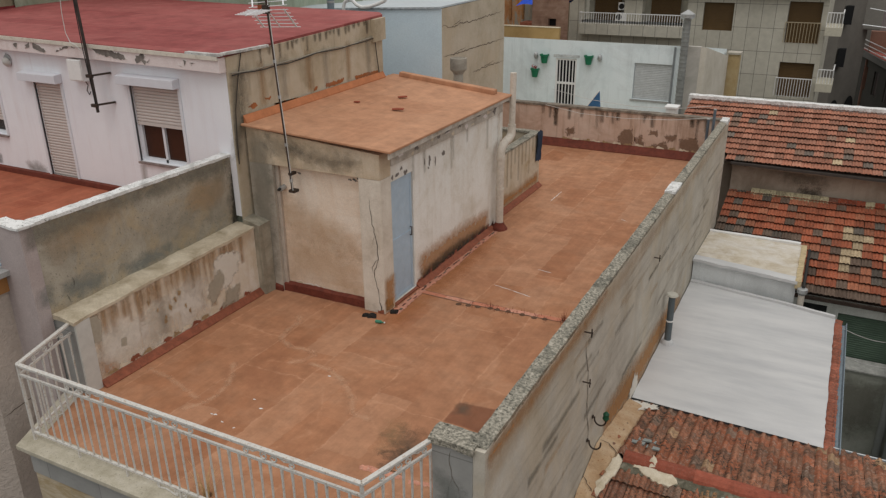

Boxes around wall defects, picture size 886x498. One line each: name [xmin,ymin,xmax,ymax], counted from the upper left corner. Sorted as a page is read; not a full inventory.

crack [442,11,501,28]
peeling [12,42,75,53]
peeling [91,48,150,66]
crack [445,38,503,71]
peeling [562,114,699,153]
crack [369,205,382,310]
water stain [421,215,487,278]
peeling [102,250,251,374]